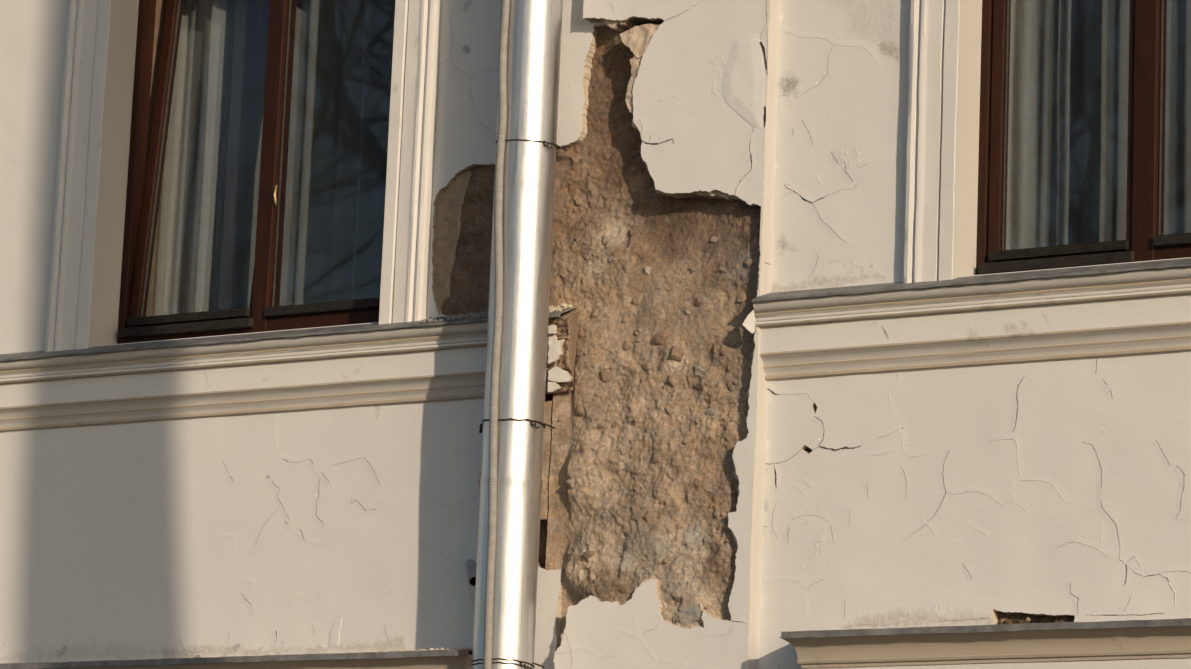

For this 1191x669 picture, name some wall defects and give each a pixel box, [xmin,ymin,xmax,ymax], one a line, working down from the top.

crack [634,115,674,146]
crack [735,128,758,196]
crack [777,90,872,246]
spalling [433,165,495,316]
spalling [540,22,761,634]
crack [248,413,380,554]
crack [765,358,1191,616]
crack [177,631,230,657]
crack [557,634,619,669]
spalling [997,611,1075,624]